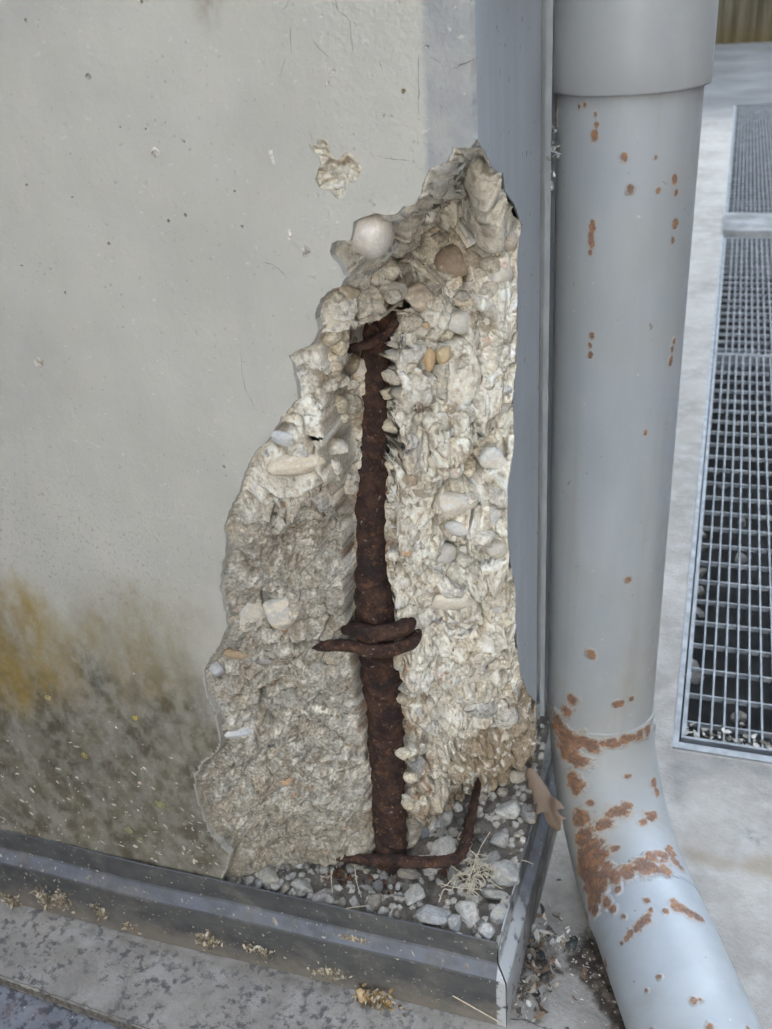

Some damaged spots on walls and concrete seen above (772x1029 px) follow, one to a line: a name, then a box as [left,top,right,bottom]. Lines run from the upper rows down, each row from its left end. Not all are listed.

spalling [119,139,538,896]
leakage [0,681,229,880]
rust [310,866,403,895]